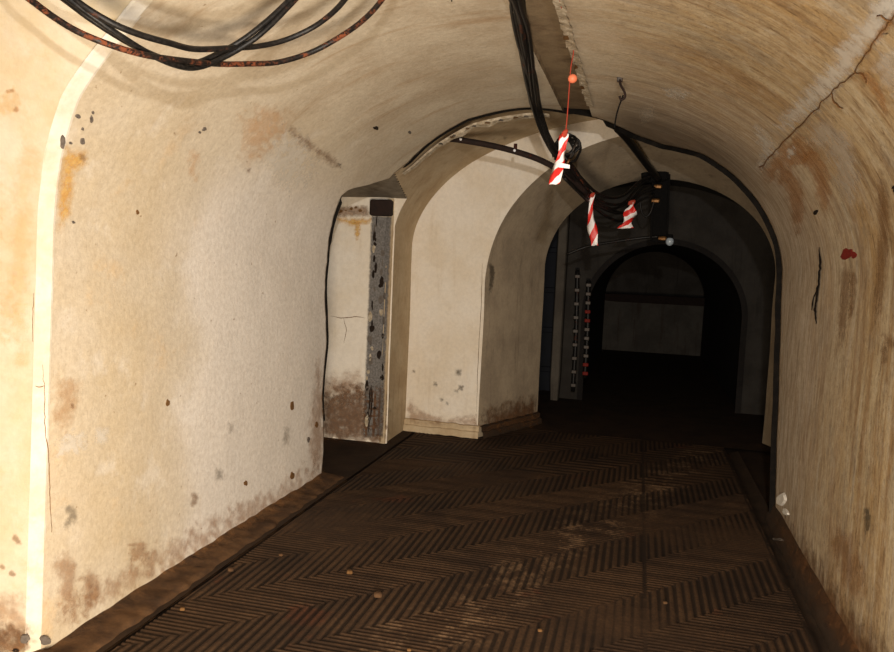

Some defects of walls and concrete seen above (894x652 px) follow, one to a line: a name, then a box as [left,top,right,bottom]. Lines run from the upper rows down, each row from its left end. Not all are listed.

crack [759,15,894,168]
damp [323,383,384,443]
damp [0,625,28,652]